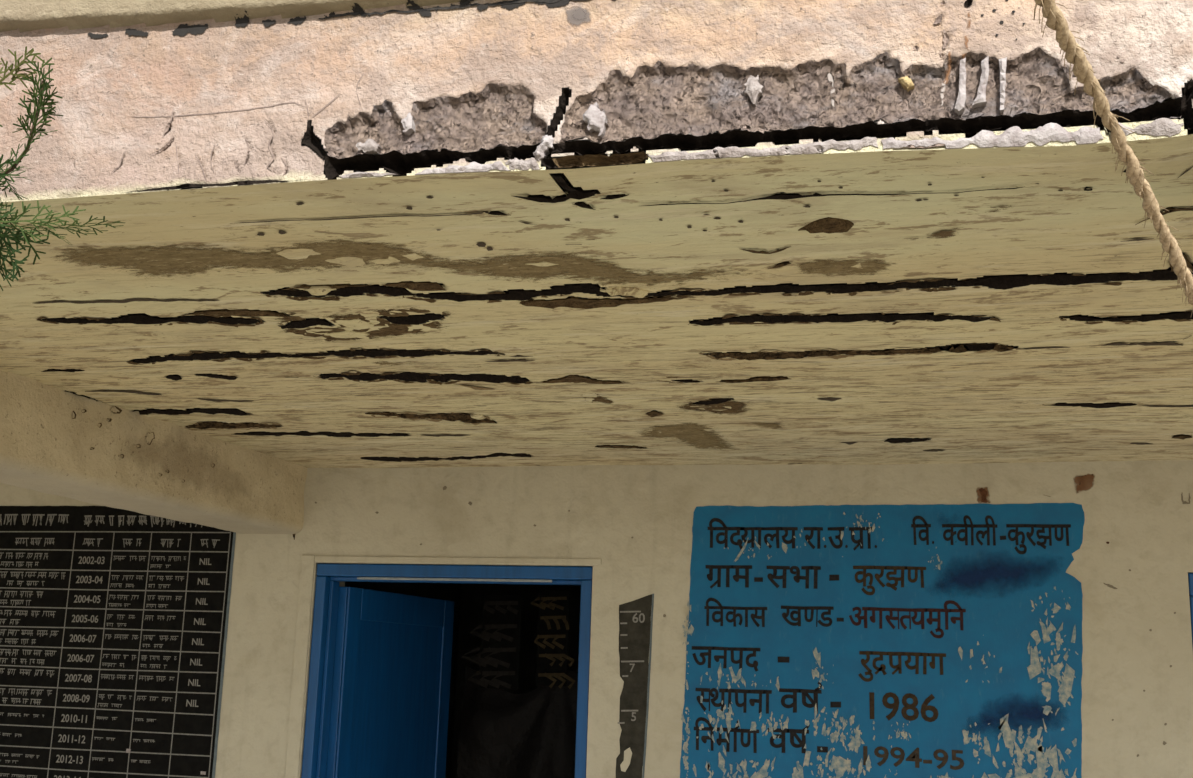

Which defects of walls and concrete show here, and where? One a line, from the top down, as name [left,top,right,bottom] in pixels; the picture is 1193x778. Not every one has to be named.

spalling [324,47,1184,175]
crack [111,73,1193,225]
peeling [798,217,854,234]
flaking render [904,227,962,240]
peeling [51,238,753,289]
peeling [795,259,896,276]
flaking render [274,306,454,342]
peeling [641,397,781,450]
peeling [681,600,789,778]
peeling [812,648,834,689]
peeling [958,587,1078,778]
peeling [792,704,911,778]